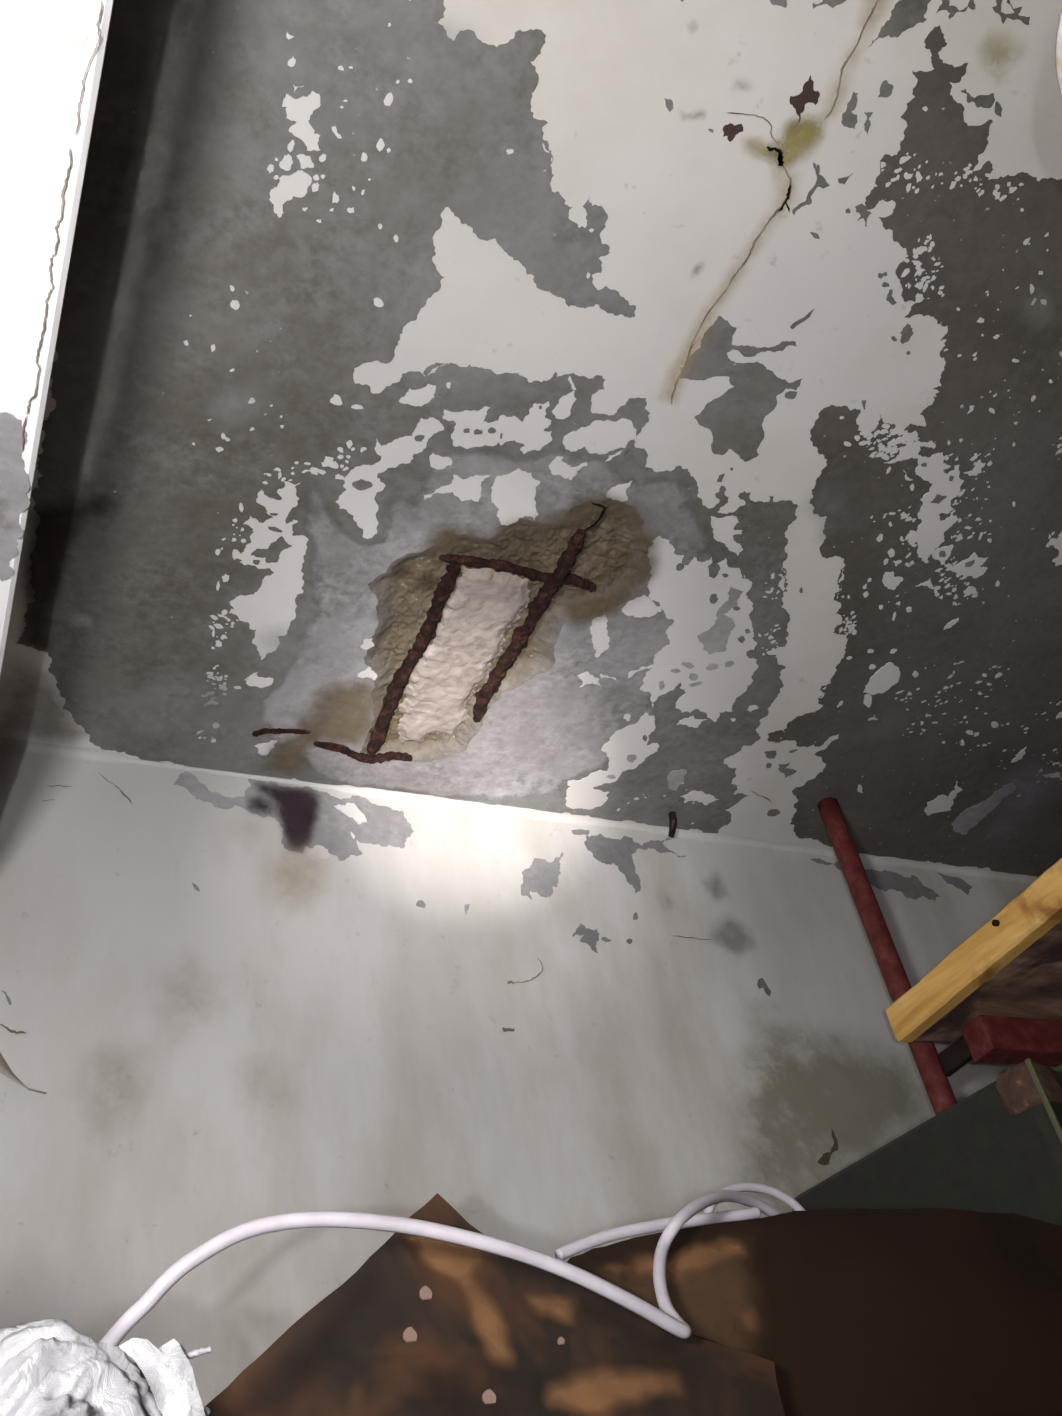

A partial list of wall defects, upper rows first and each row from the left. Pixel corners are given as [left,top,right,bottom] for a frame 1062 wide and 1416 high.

crack [825,0,878,118]
crack [22,1,103,460]
crack [671,112,792,405]
peeling [0,0,1062,901]
peeling [572,923,632,953]